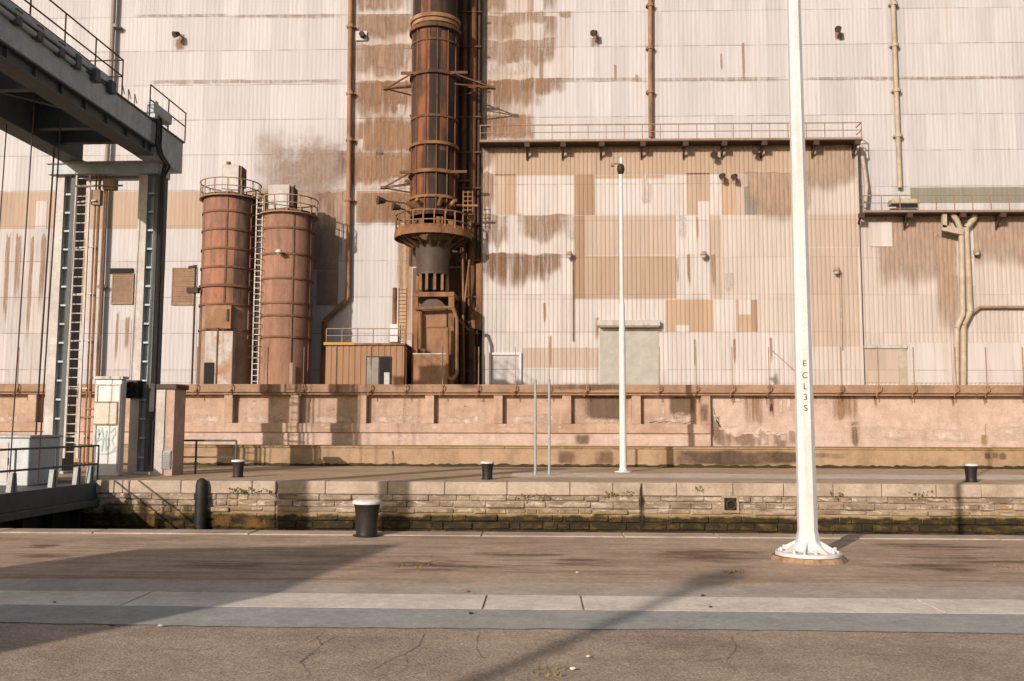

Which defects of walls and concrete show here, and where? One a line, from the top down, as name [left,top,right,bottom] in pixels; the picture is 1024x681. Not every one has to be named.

corrosion [480,0,570,283]
corrosion [3,233,46,325]
corrosion [115,314,129,351]
damp [138,501,147,522]